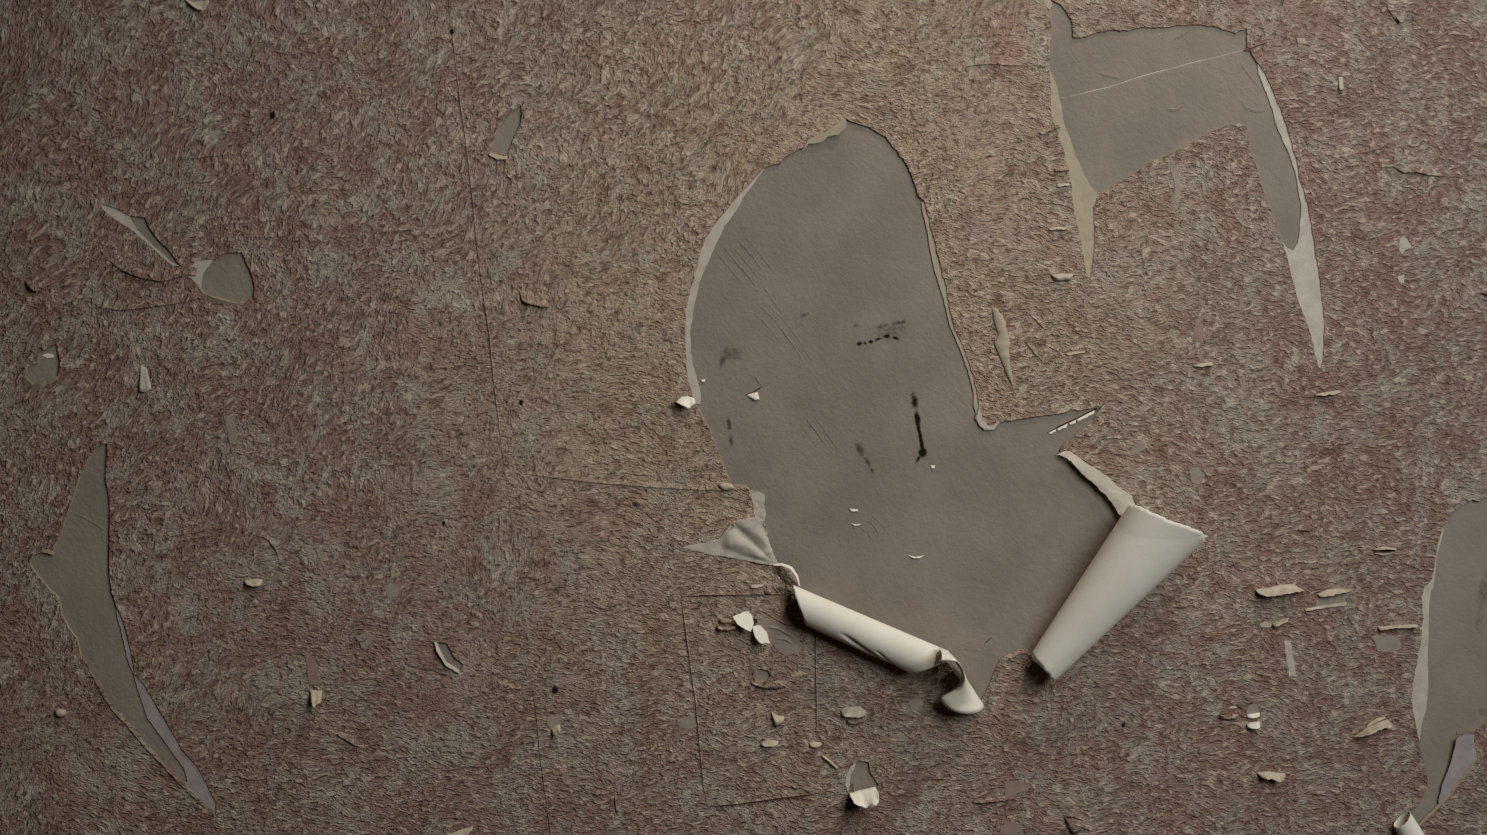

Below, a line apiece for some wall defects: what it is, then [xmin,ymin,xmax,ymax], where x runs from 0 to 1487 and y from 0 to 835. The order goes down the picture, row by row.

peeling [87,203,254,310]
peeling [675,118,1208,714]
peeling [1038,0,1324,368]
peeling [841,706,868,724]